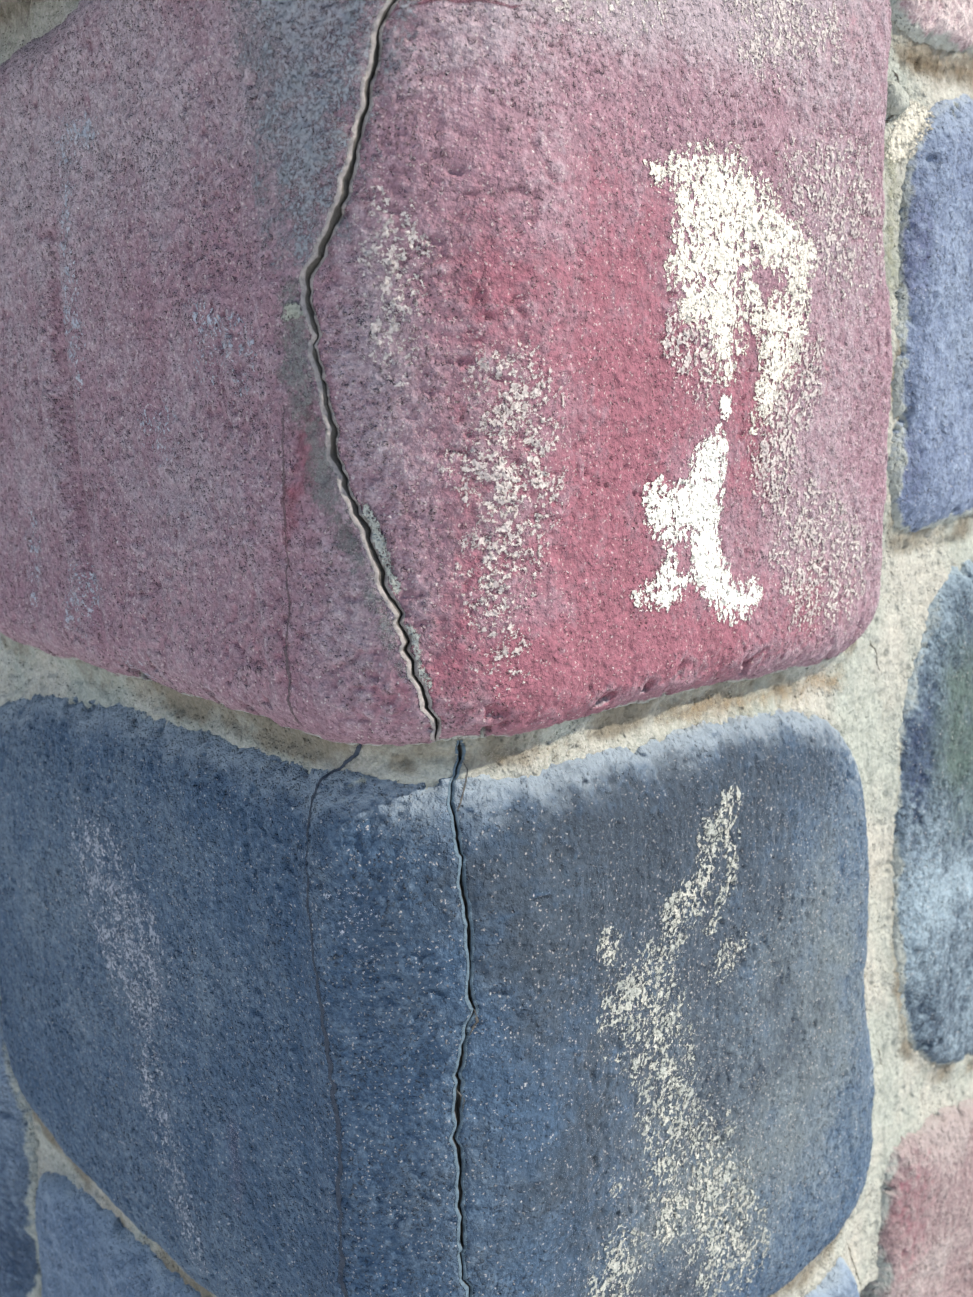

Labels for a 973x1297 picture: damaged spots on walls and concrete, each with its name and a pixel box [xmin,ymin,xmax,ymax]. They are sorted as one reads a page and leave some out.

peeling [725,0,849,92]
peeling [631,120,885,644]
crack [272,0,526,1297]
peeling [585,785,774,1297]